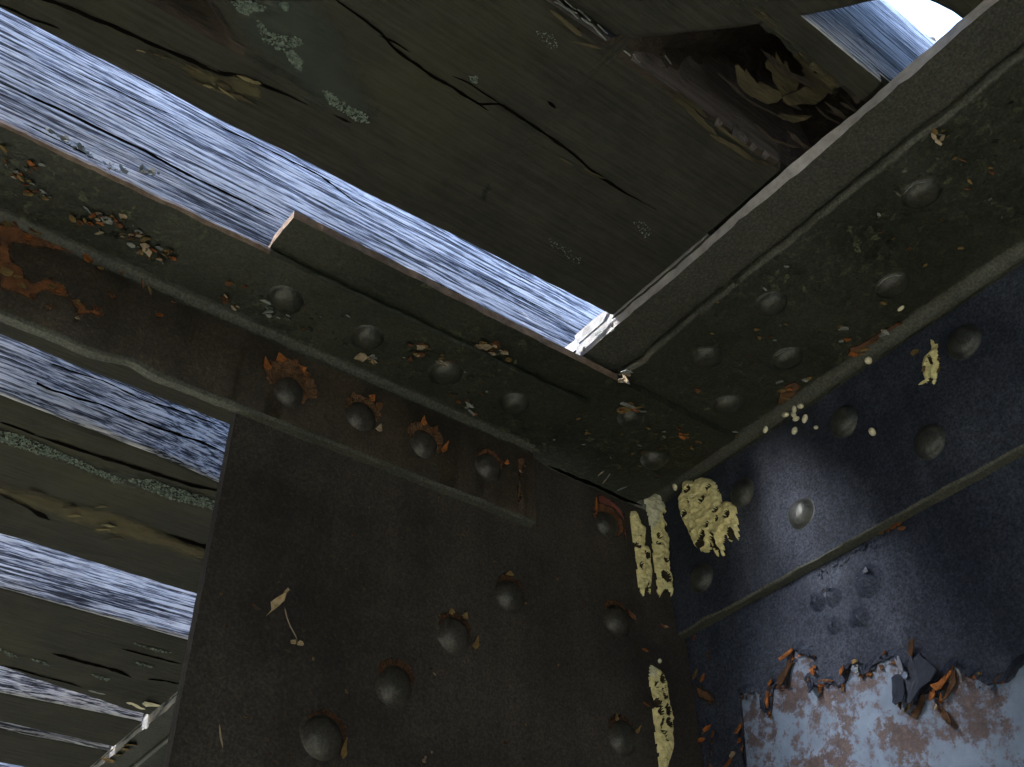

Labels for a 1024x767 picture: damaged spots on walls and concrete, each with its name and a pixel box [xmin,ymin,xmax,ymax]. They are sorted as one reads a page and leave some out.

crack [336,0,656,210]
rust [0,220,104,320]
crack [548,465,642,506]
peeling [723,639,1024,767]